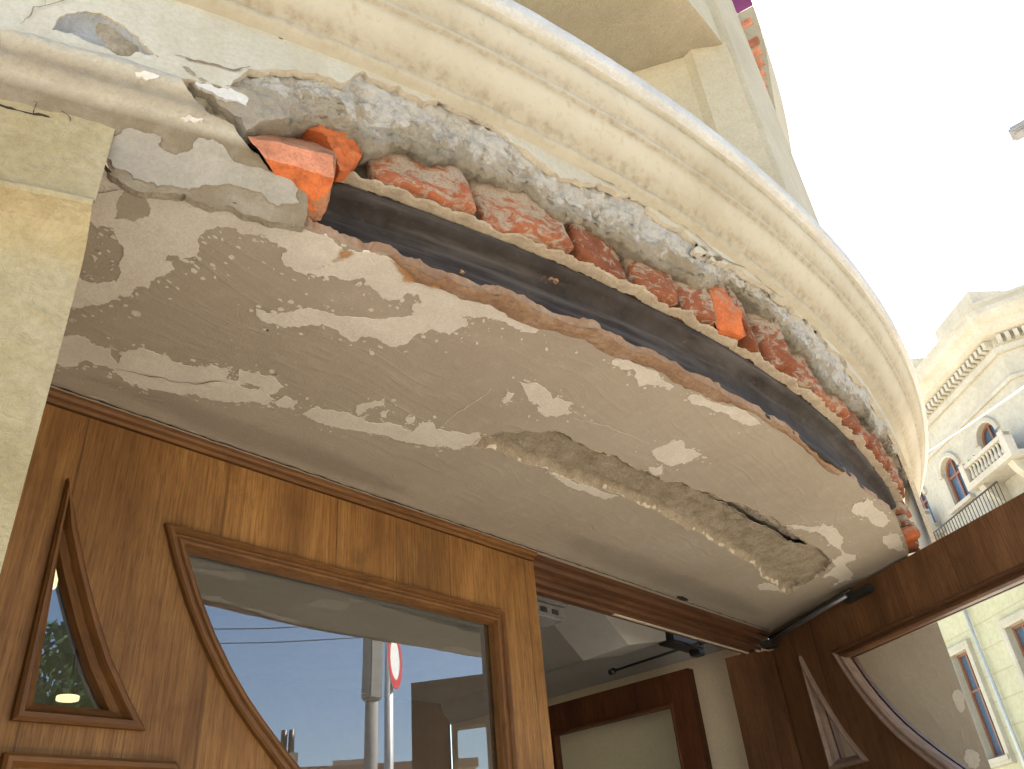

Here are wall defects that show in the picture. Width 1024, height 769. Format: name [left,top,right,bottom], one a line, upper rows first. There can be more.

spalling [54,12,152,56]
peeling [56,61,921,594]